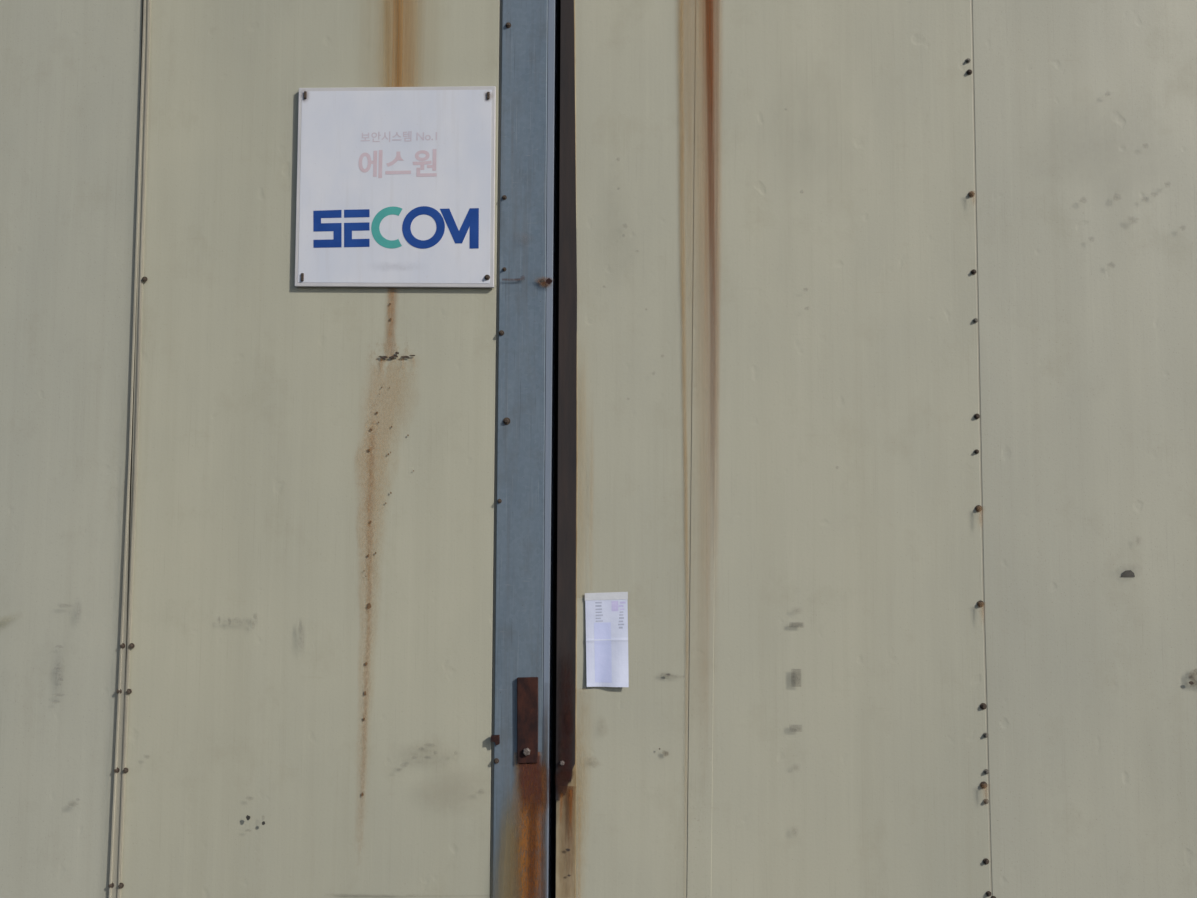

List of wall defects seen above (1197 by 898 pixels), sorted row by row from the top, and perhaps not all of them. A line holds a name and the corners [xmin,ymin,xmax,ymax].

rust [390,0,409,87]
rust [706,0,714,232]
rust [500,671,573,898]